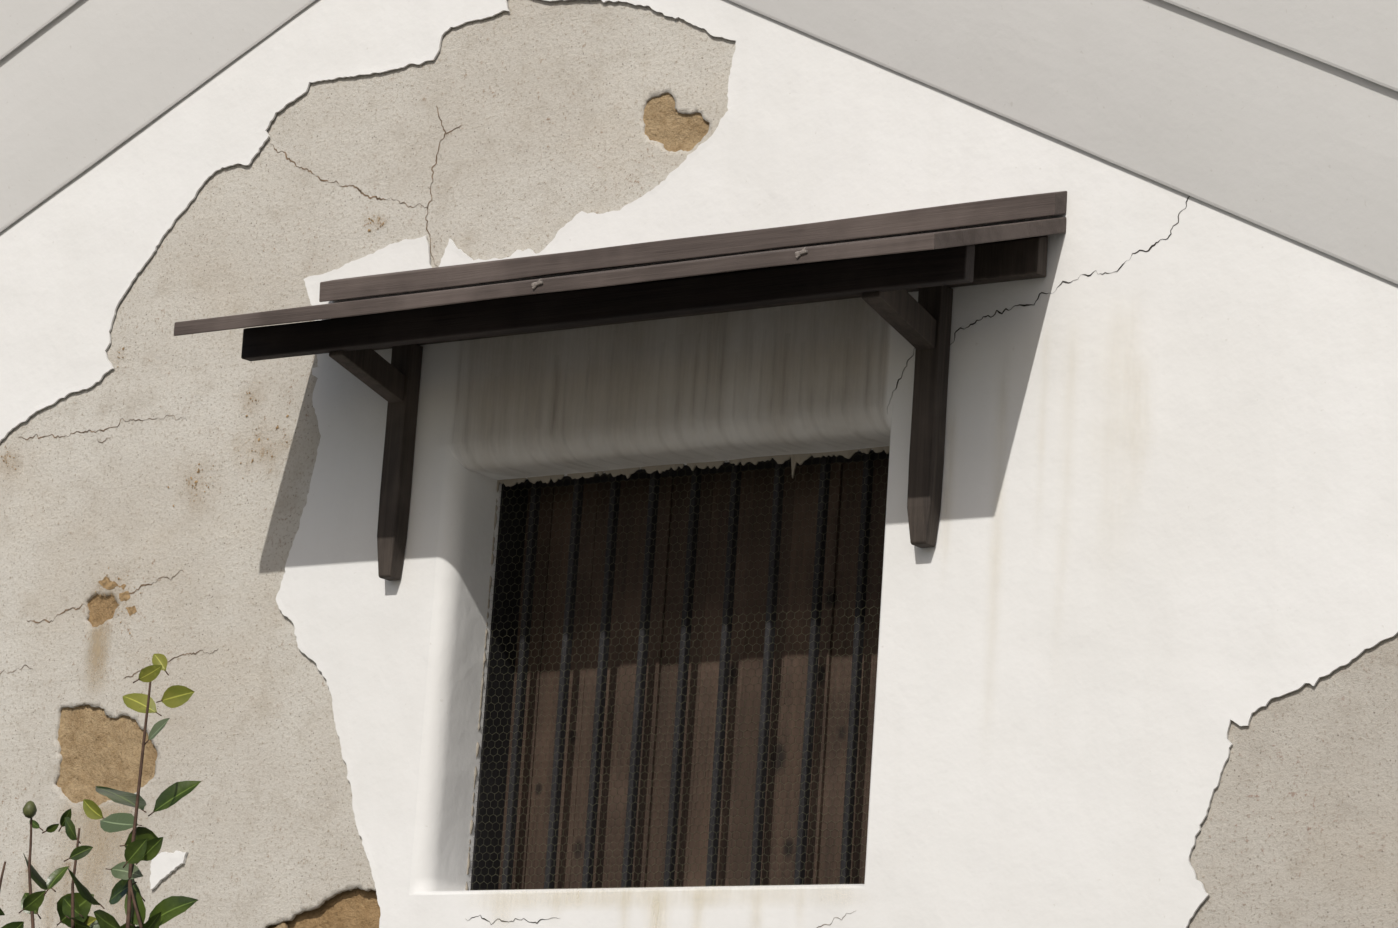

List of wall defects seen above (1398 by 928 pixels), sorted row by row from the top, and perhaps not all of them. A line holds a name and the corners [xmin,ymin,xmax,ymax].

crack [268,107,459,259]
crack [950,196,1190,345]
crack [18,415,185,443]
flaking render [0,0,736,928]
crack [125,649,218,678]
flaking render [1187,634,1398,928]